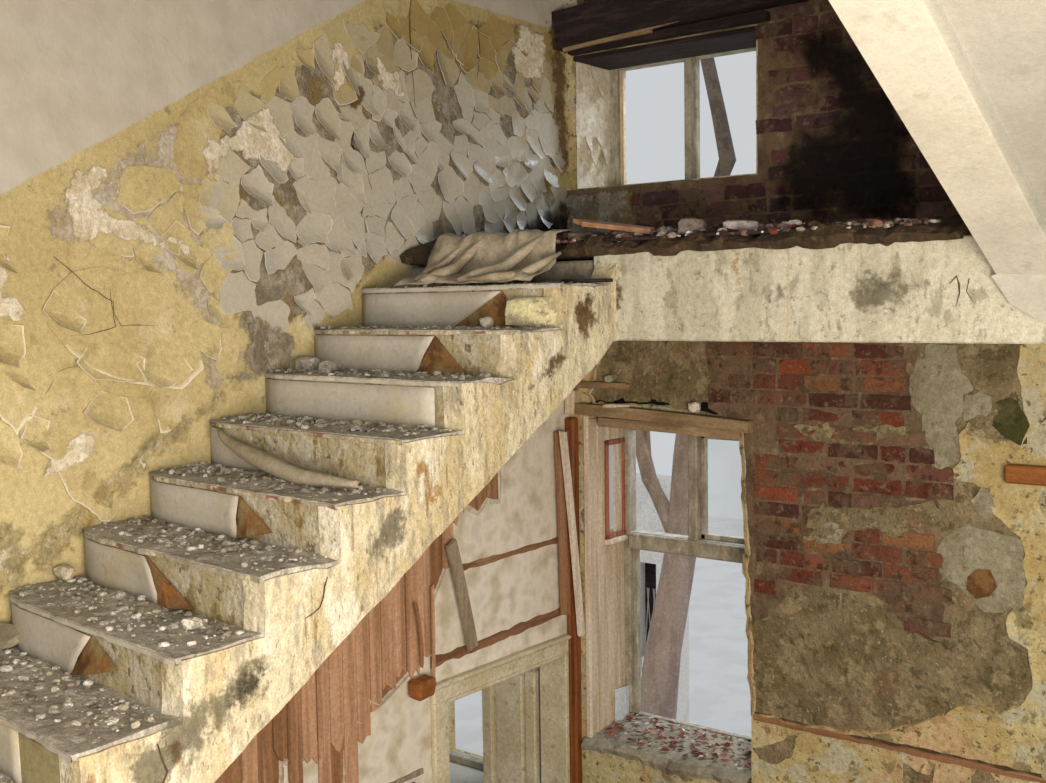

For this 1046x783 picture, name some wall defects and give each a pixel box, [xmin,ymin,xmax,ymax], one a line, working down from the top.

crack [54,257,154,336]
peeling [0,0,960,592]
damp [135,658,267,783]
spalling [214,469,501,783]
spalling [586,340,1046,764]
spalling [898,758,940,783]